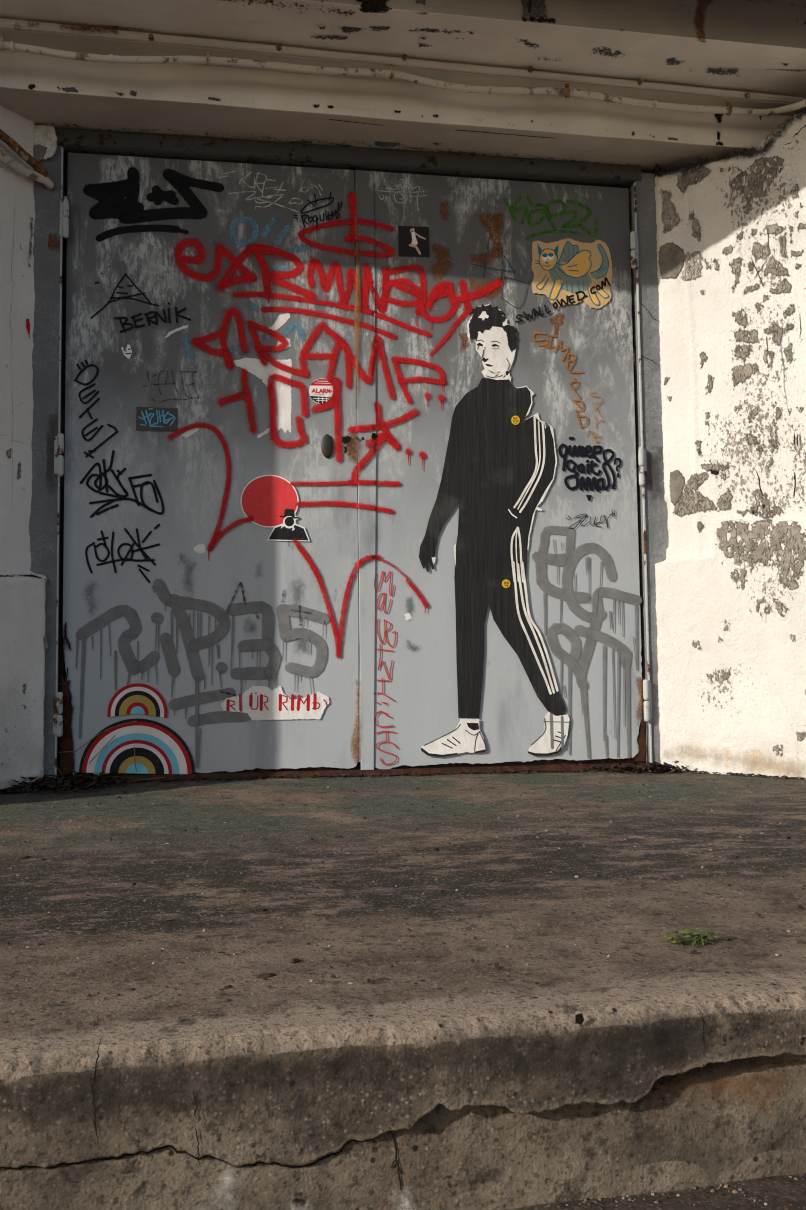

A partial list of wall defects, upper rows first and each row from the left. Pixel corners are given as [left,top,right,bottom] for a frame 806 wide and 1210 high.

rust [670,0,711,42]
peeling [658,133,806,618]
rust [59,622,75,776]
crack [0,1014,411,1198]